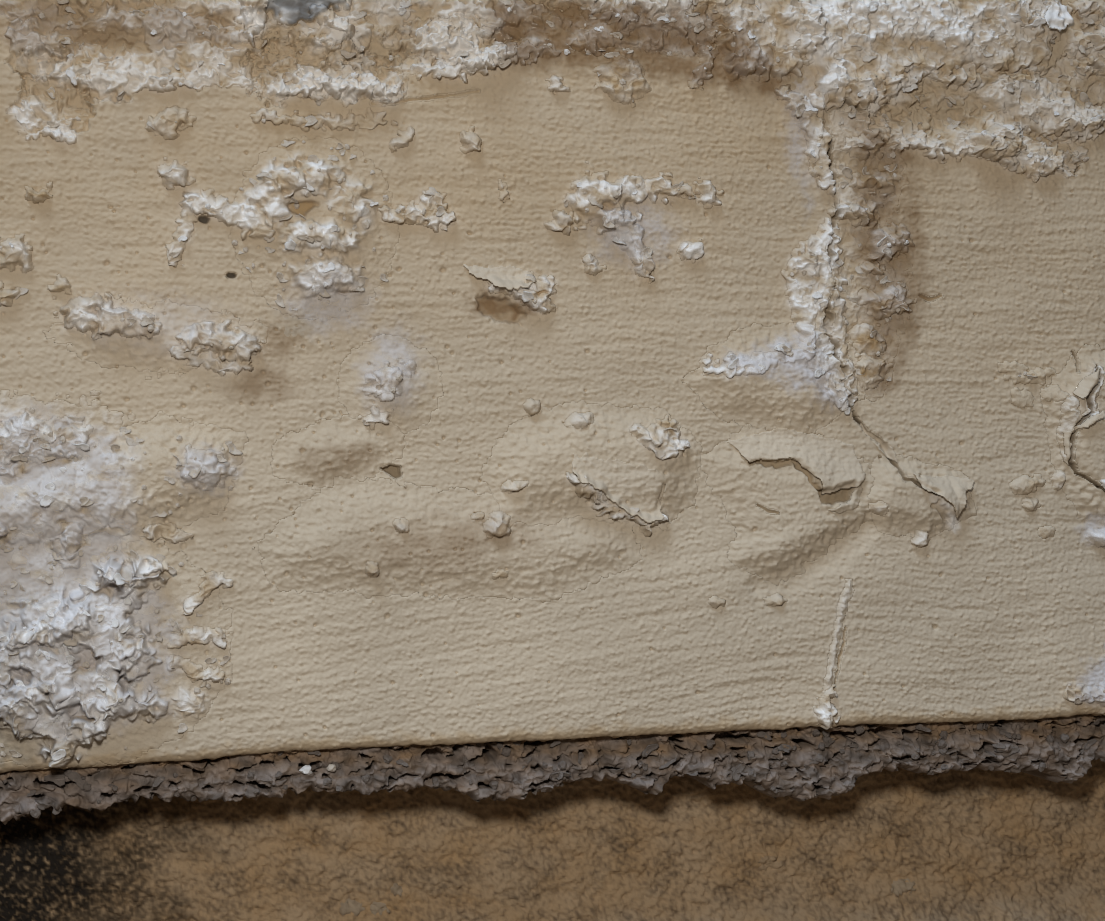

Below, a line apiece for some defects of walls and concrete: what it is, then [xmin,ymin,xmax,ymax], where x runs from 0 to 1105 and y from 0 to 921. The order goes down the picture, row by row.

flaking render [0,0,718,145]
flaking render [823,0,1105,408]
peeling [463,264,536,290]
crack [820,92,939,496]
crack [918,293,944,303]
crack [1057,350,1105,492]
peeling [572,452,665,523]
crack [756,503,780,515]
efflorescence [0,390,249,769]
efflorescence [1063,660,1105,715]
spalling [0,714,1105,825]
damp [0,798,130,921]